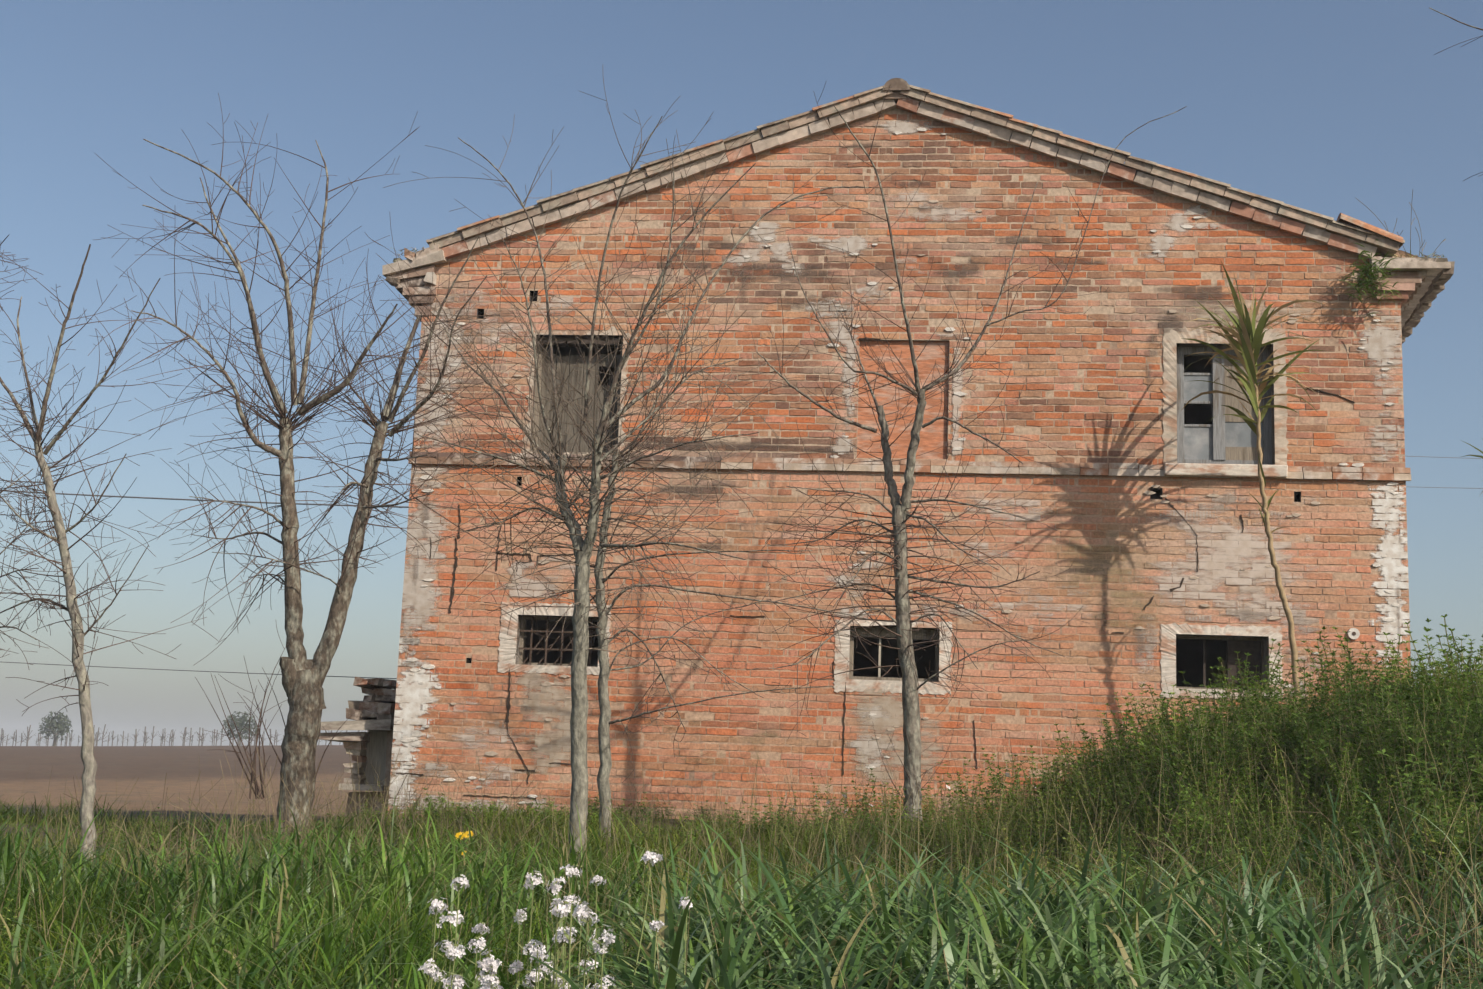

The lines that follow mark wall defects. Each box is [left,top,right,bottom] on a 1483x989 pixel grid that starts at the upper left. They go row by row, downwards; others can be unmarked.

peeling [414,290,530,448]
peeling [533,296,573,314]
peeling [1339,309,1404,467]
crack [429,505,461,613]
peeling [388,468,575,814]
crack [496,525,574,572]
crack [1112,498,1199,634]
peeling [1369,482,1410,667]